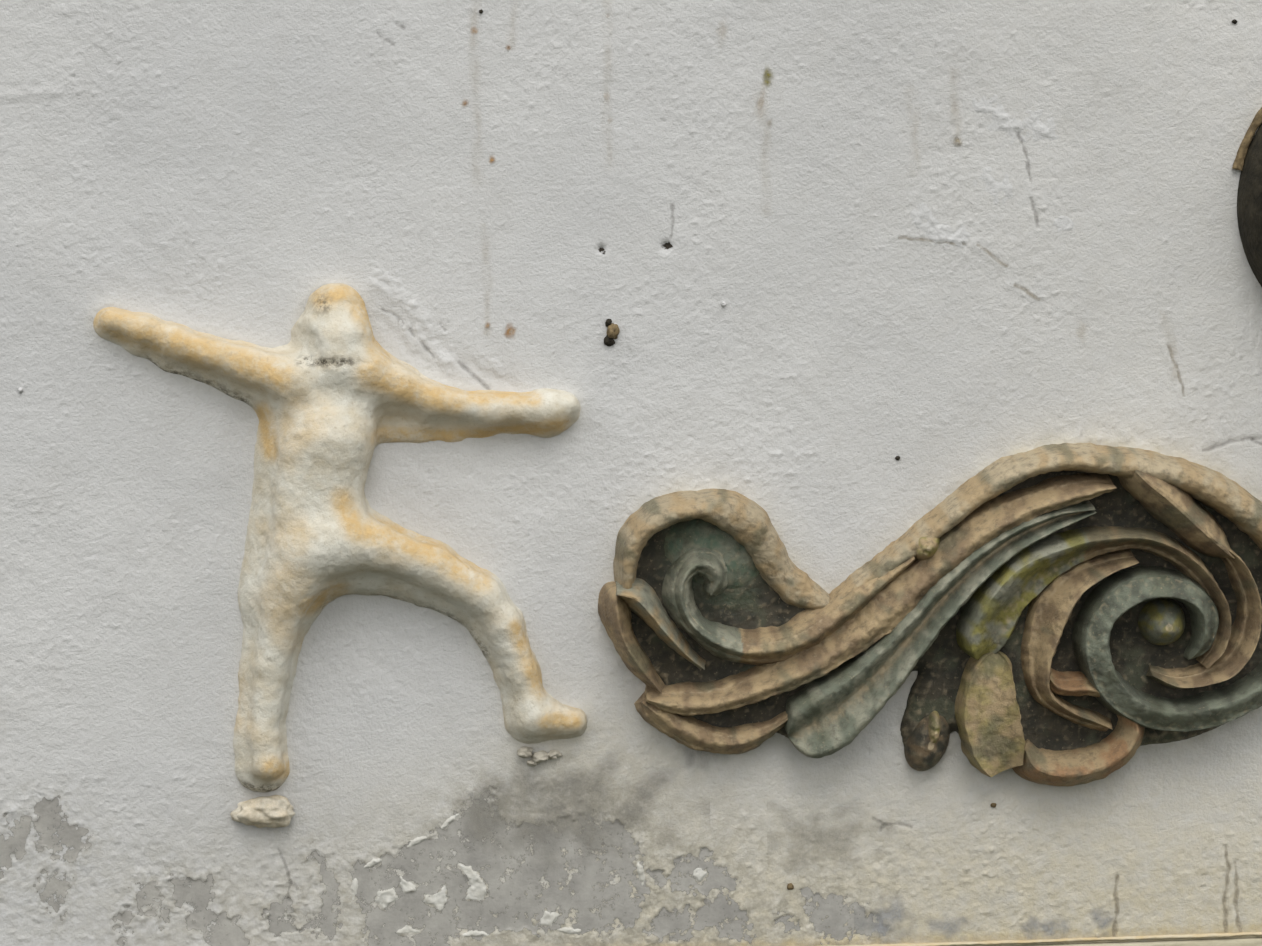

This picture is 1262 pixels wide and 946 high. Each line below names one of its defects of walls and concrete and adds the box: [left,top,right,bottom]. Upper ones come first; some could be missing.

peeling [0,795,91,921]
peeling [261,791,756,946]